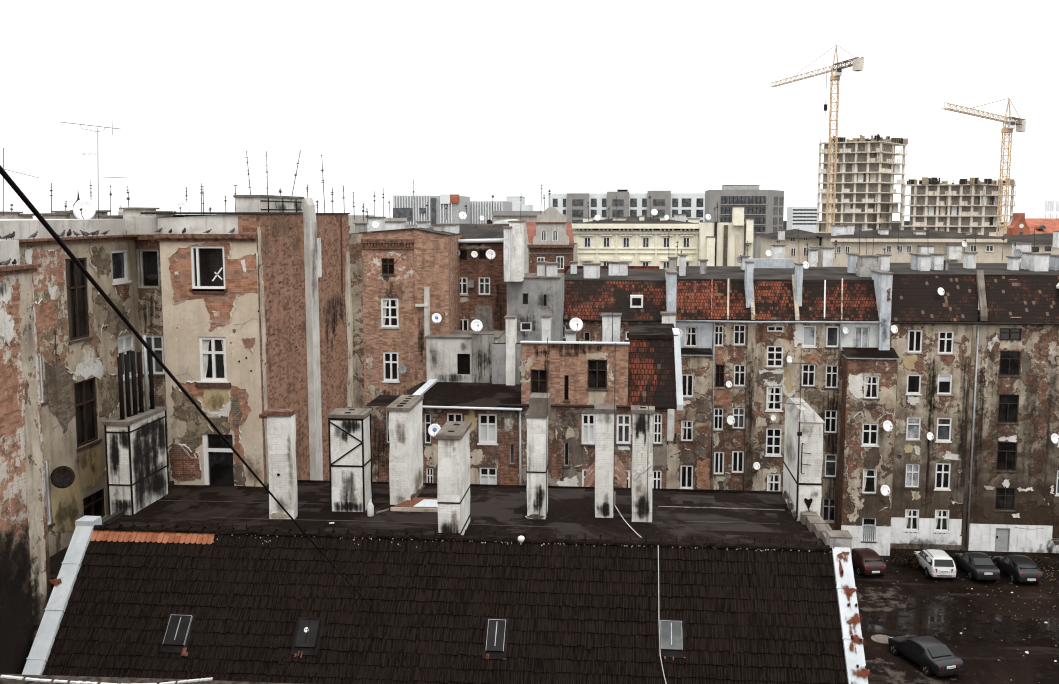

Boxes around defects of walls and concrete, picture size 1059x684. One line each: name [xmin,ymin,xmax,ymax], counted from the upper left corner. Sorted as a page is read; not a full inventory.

flaking render [10,247,66,342]
peeling [90,246,131,341]
flaking render [168,241,275,362]
peeling [168,380,213,484]
flaking render [220,385,251,486]
leakage [334,492,362,512]
leakage [441,522,459,535]
peeling [755,369,826,407]
flaking render [844,397,953,527]
corrosion [837,552,857,601]
corrosion [847,613,864,653]
corrosion [851,667,870,684]